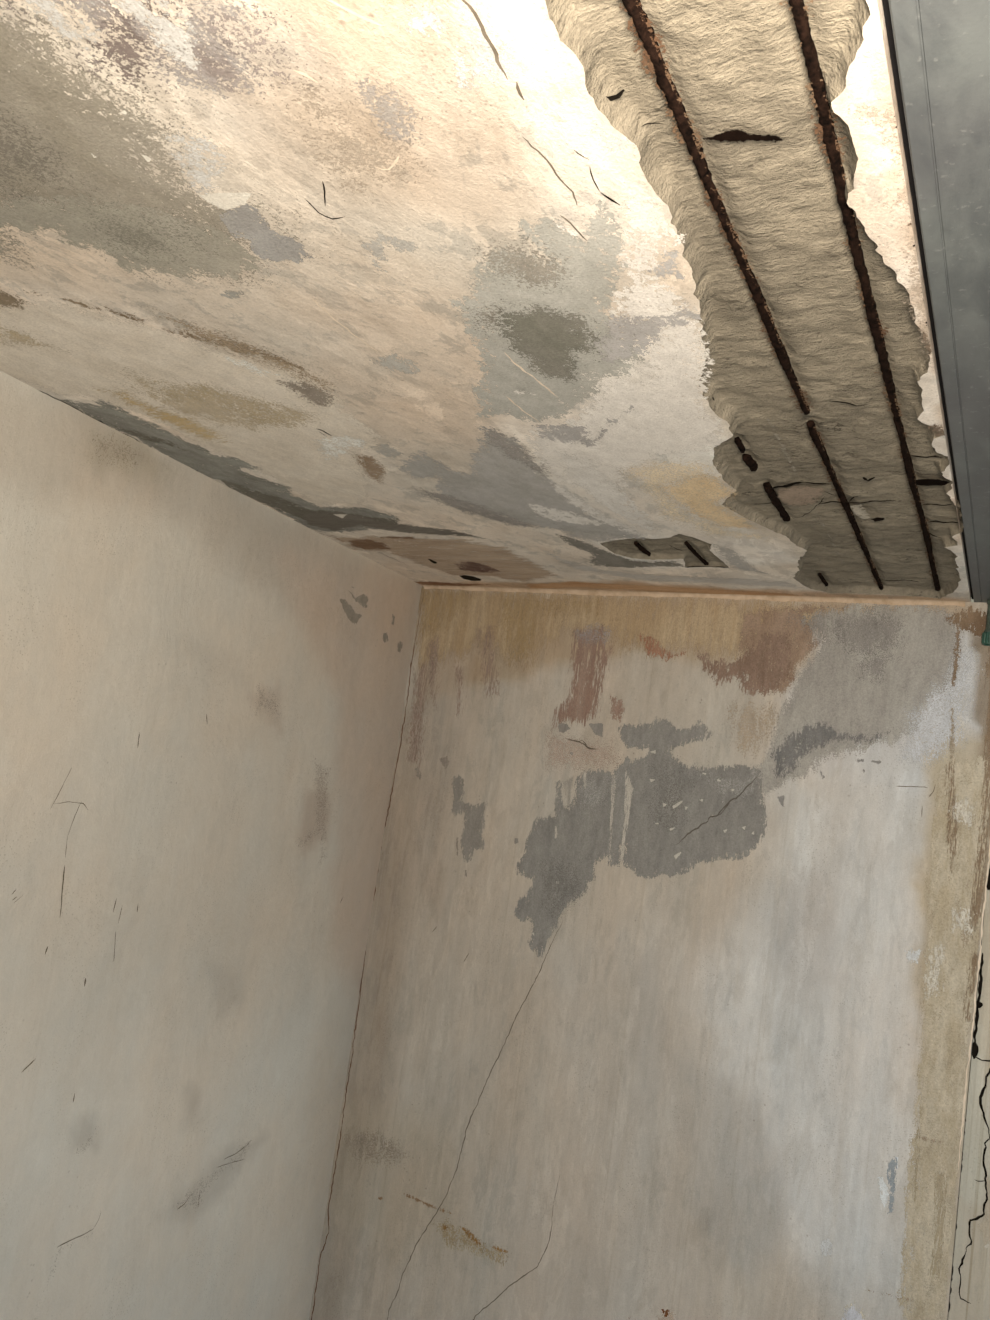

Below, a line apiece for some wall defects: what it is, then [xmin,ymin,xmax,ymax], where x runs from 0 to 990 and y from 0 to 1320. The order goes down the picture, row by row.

damp [0,289,386,484]
damp [0,0,435,299]
crack [462,0,524,100]
peeling [369,197,728,568]
corrosion [618,1,785,360]
spalling [545,0,964,599]
corrosion [805,72,849,195]
damp [406,523,916,765]
peeling [514,717,785,957]
corrosion [404,1193,512,1267]
crack [387,926,561,1320]
crack [948,953,990,1312]